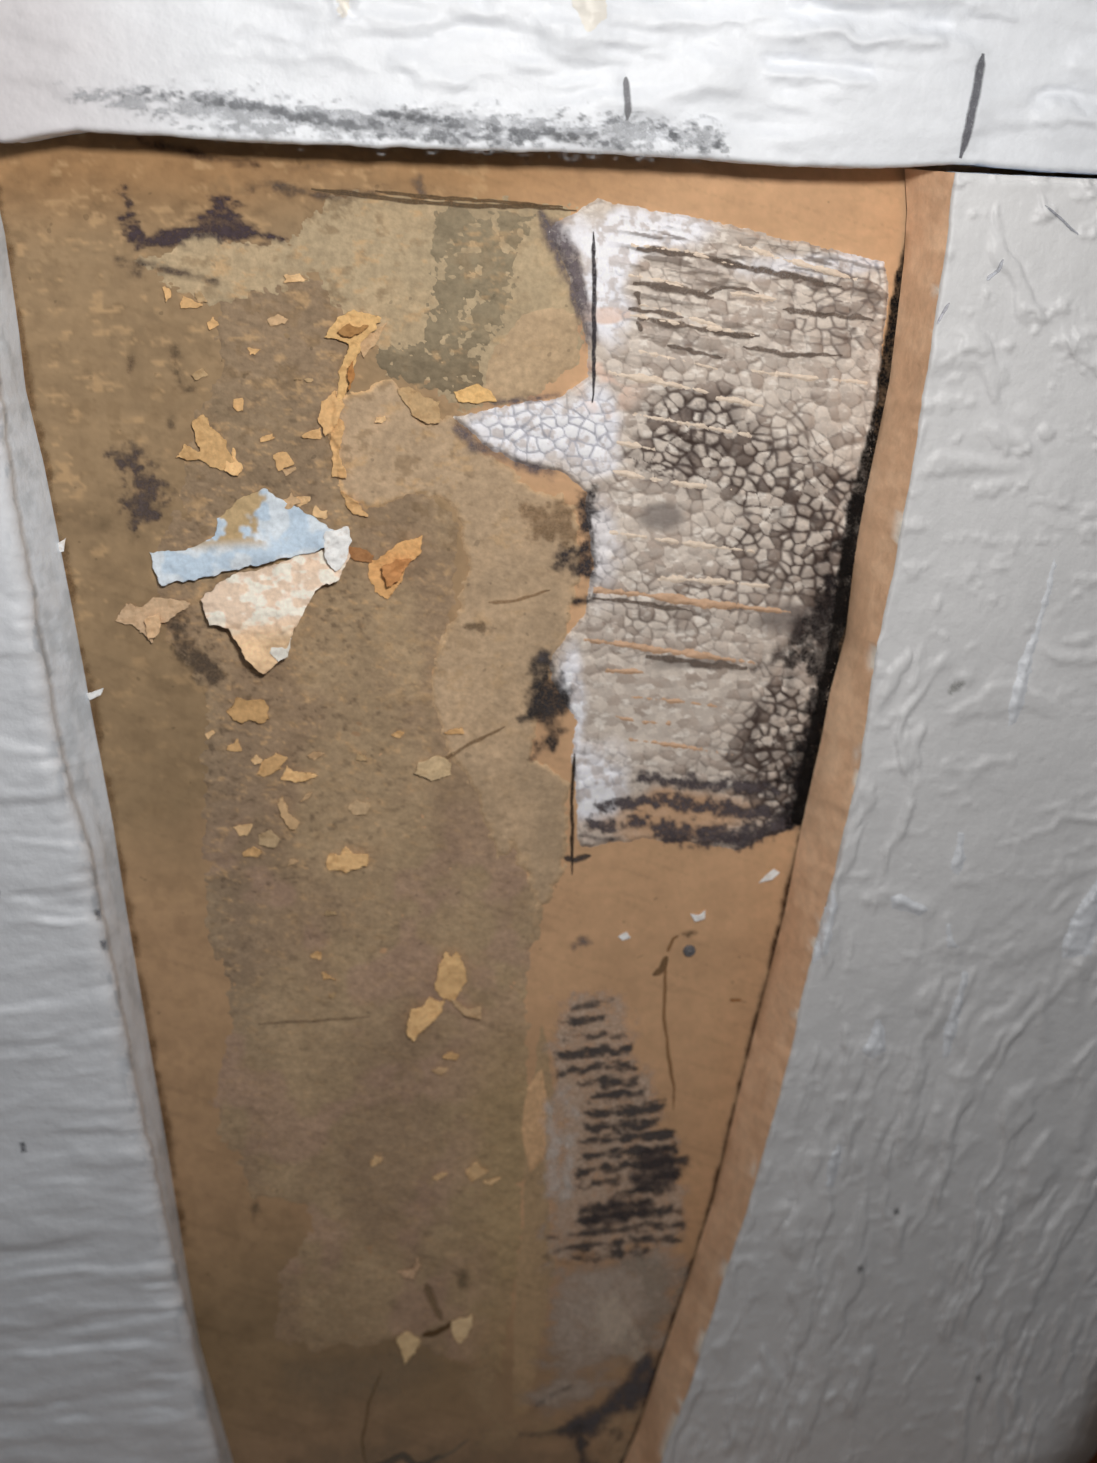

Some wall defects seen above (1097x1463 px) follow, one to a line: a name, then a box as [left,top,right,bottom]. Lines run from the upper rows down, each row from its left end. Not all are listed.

water stain [143,88,624,150]
water stain [540,211,597,339]
peeling [397,384,497,424]
peeling [116,309,422,674]
water stain [523,491,595,604]
peeling [226,697,269,724]
water stain [517,651,570,760]
water stain [586,479,854,850]
peeling [233,752,325,857]
peeling [326,847,369,873]
peeling [406,952,481,1042]
water stain [528,1001,689,1463]